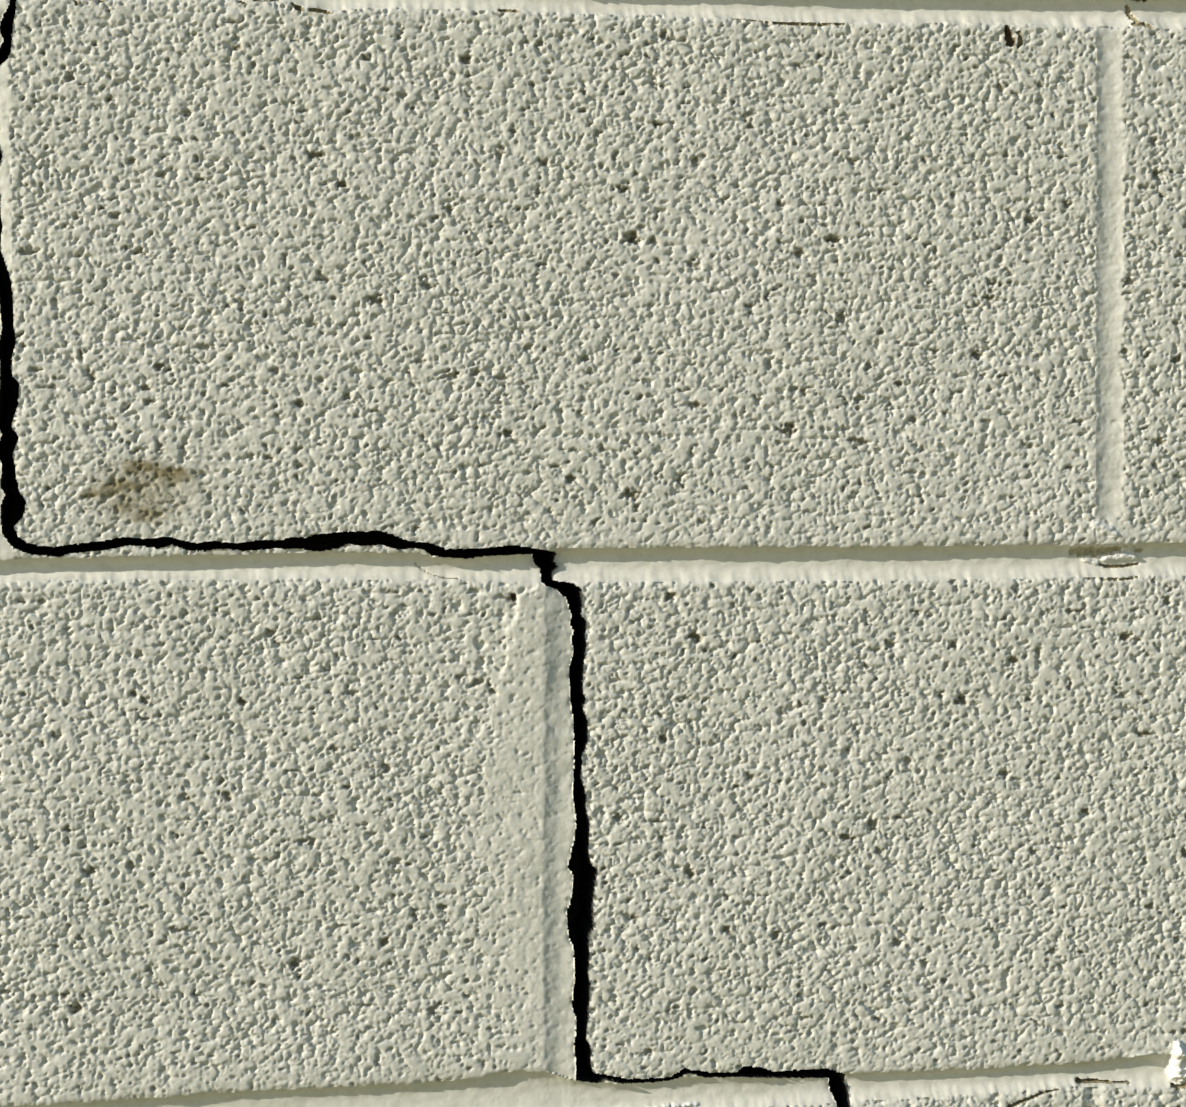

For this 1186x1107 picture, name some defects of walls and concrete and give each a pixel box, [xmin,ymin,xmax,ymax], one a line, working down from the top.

crack [0,0,17,65]
crack [0,196,851,1107]